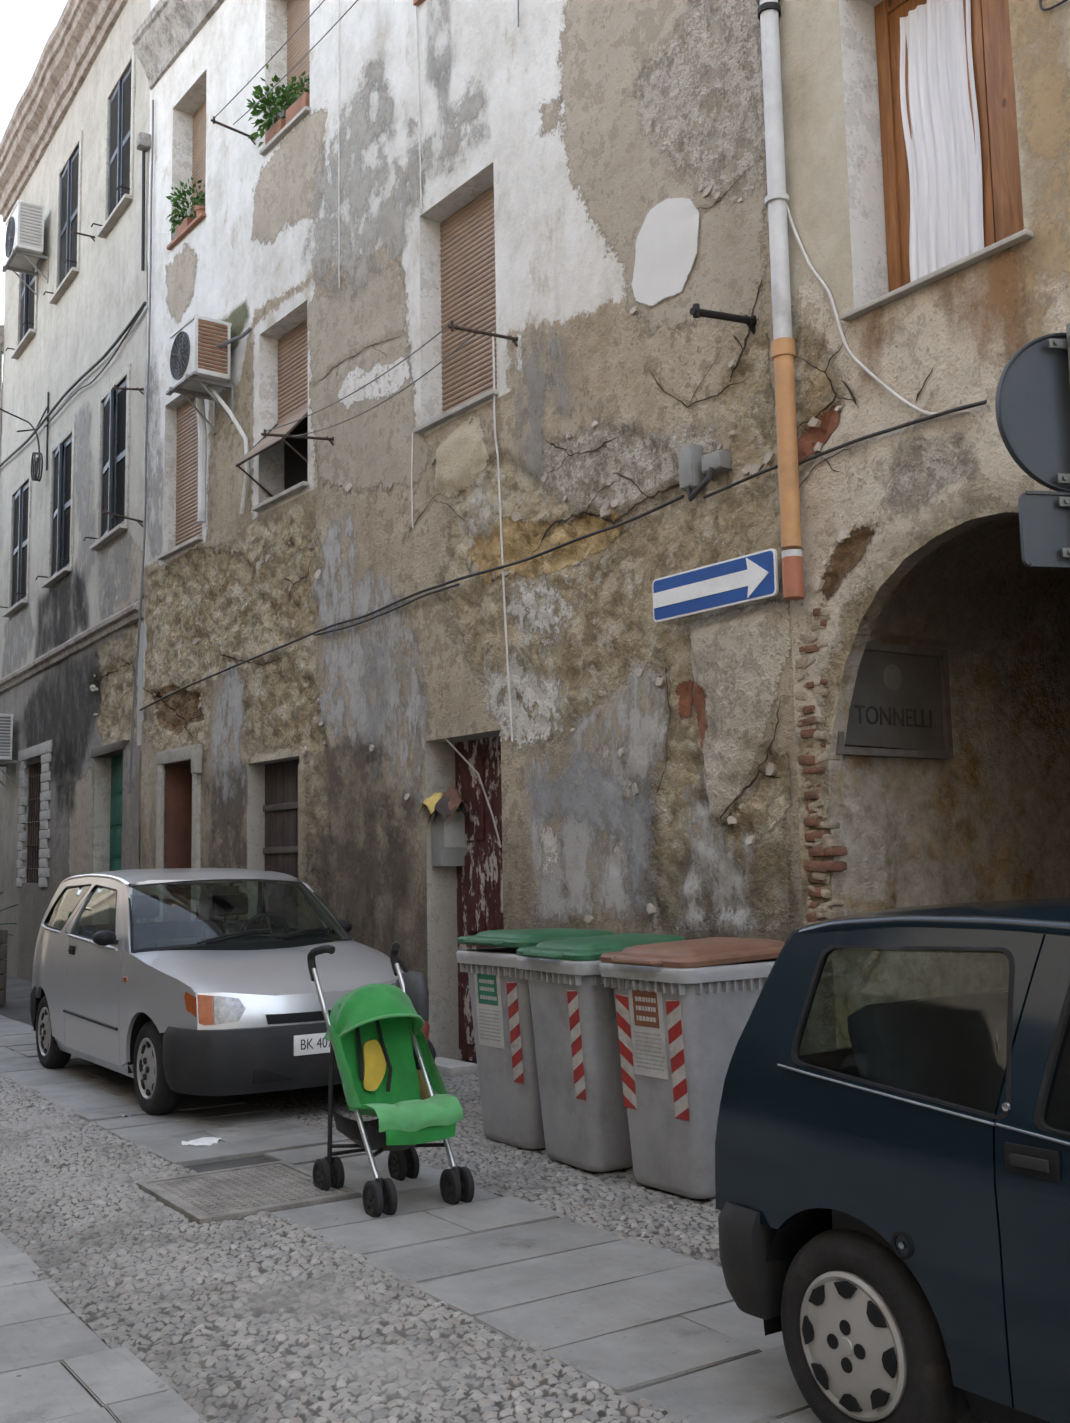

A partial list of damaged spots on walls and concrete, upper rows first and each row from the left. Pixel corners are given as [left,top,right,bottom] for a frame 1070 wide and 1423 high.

peeling [251,108,328,245]
peeling [467,0,775,584]
crack [649,279,762,408]
crack [531,434,680,556]
flaking render [797,401,842,462]
peeling [89,513,428,819]
flaking render [680,525,875,937]